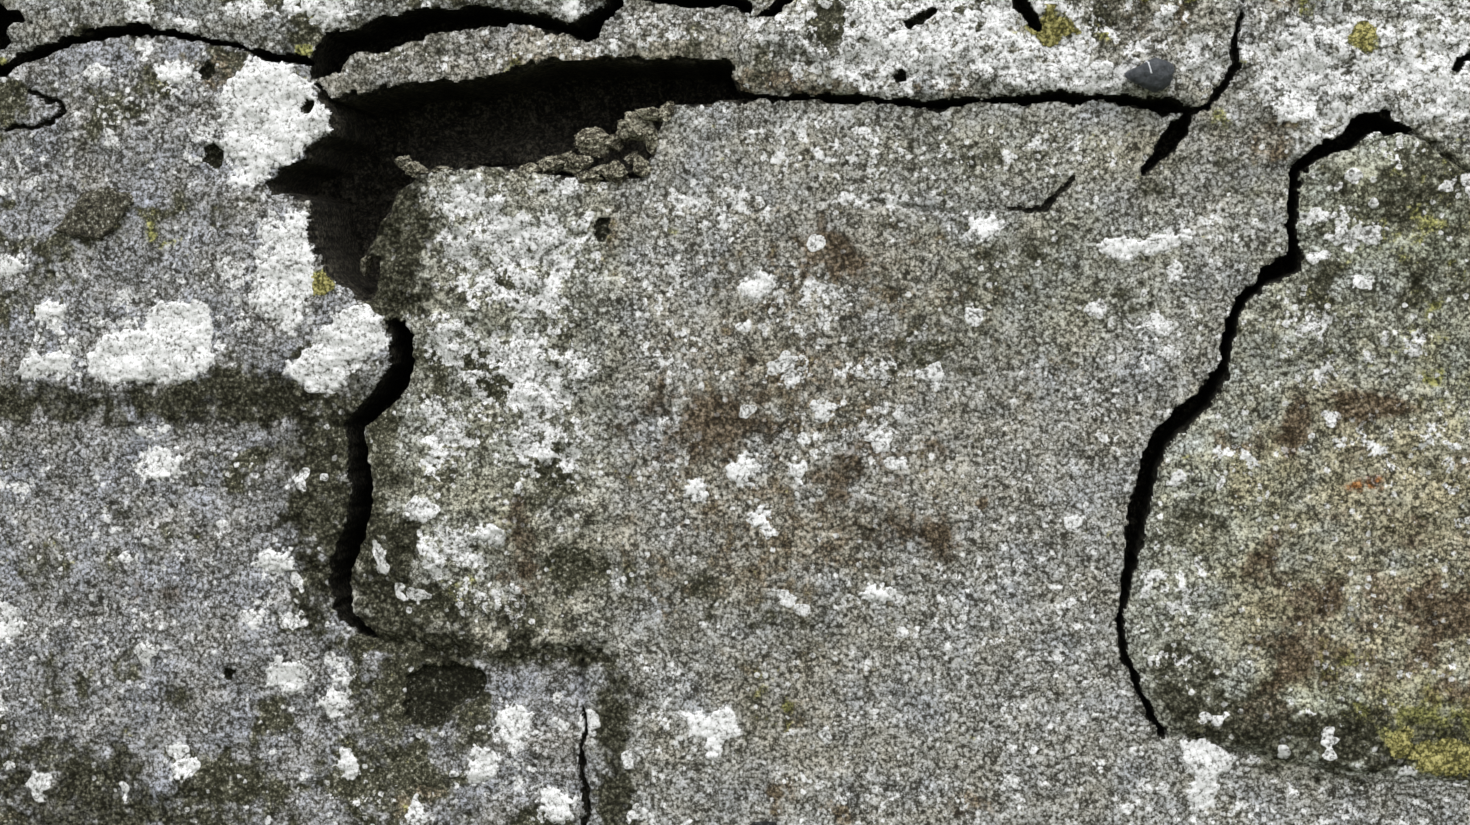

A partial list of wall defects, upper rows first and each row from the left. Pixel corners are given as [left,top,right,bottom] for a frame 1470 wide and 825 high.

crack [1012,0,1042,32]
crack [0,0,794,132]
crack [1452,53,1470,73]
spalling [300,99,315,114]
crack [740,12,1244,176]
crack [1007,175,1075,213]
spalling [594,217,611,242]
crack [1115,109,1413,739]
crack [328,318,416,638]